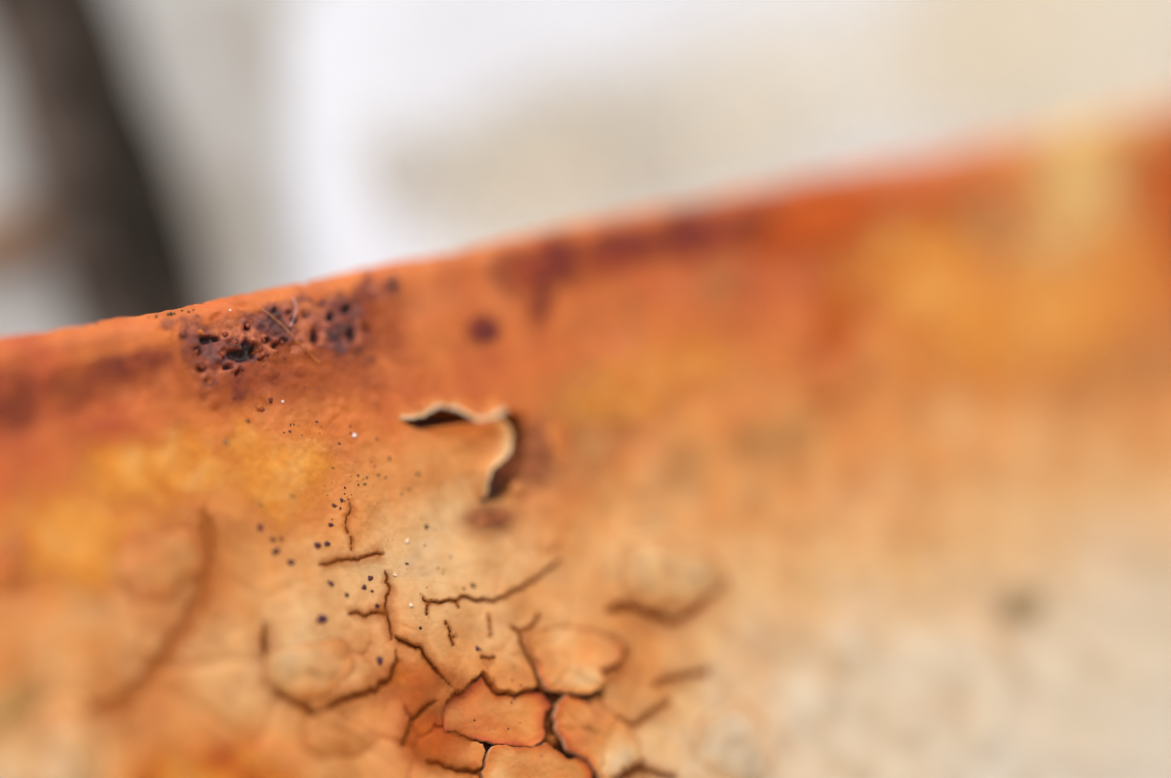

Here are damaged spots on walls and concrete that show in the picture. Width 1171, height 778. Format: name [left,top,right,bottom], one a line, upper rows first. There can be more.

rust [505,184,882,319]
rust [469,315,499,342]
rust [24,274,400,589]
peeling [399,394,513,499]
rust [494,427,551,485]
rust [472,508,510,527]
rust [328,575,380,608]
crack [607,581,724,626]
crack [261,501,559,775]
crack [600,646,626,673]
rust [395,668,469,762]
crack [617,766,675,778]